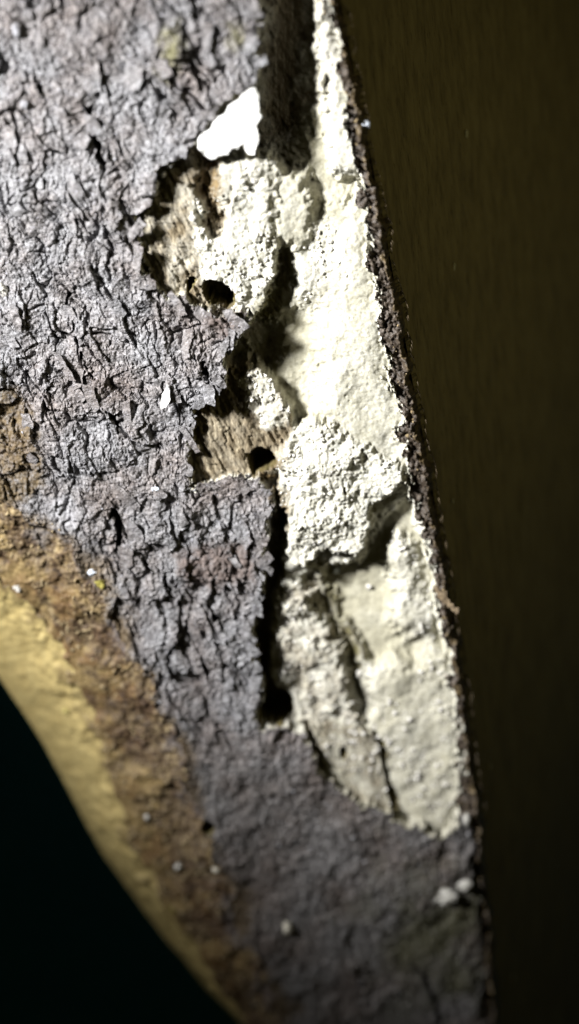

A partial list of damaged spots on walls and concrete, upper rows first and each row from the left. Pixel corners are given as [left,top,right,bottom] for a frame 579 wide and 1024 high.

crack [88,28,104,71]
crack [33,75,47,104]
crack [82,105,115,172]
crack [65,291,94,380]
crack [194,355,211,380]
peeling [127,0,468,842]